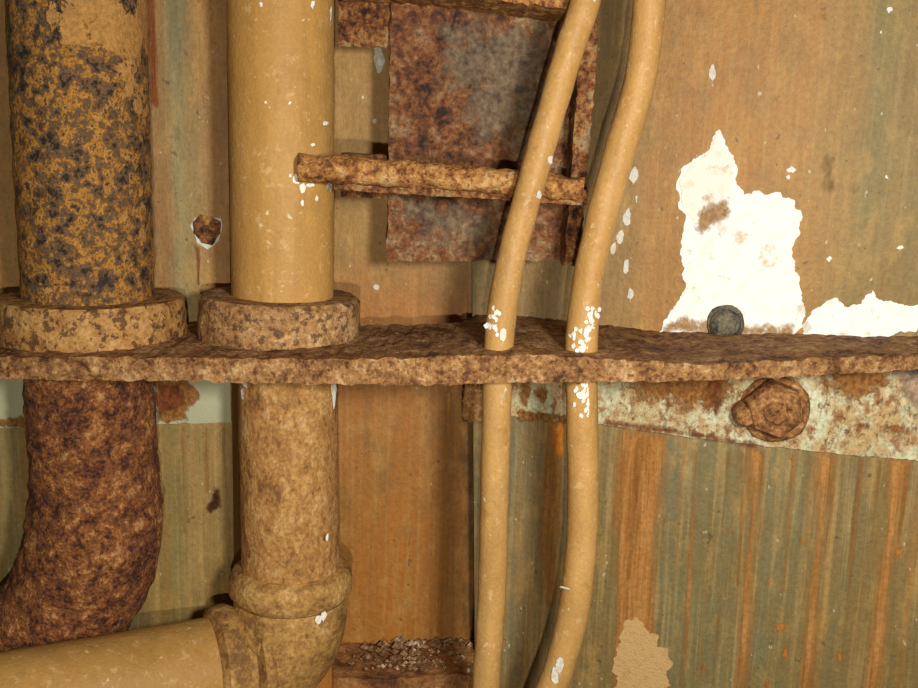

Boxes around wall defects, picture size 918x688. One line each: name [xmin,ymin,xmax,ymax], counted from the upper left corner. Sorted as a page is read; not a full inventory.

peeling [660,129,918,337]
rust [622,380,738,414]
rust [821,371,892,400]
rust [884,424,916,434]
rust [606,420,676,657]
peeling [612,618,673,688]
rust [689,432,762,688]
rust [799,452,832,688]
rust [865,458,910,688]